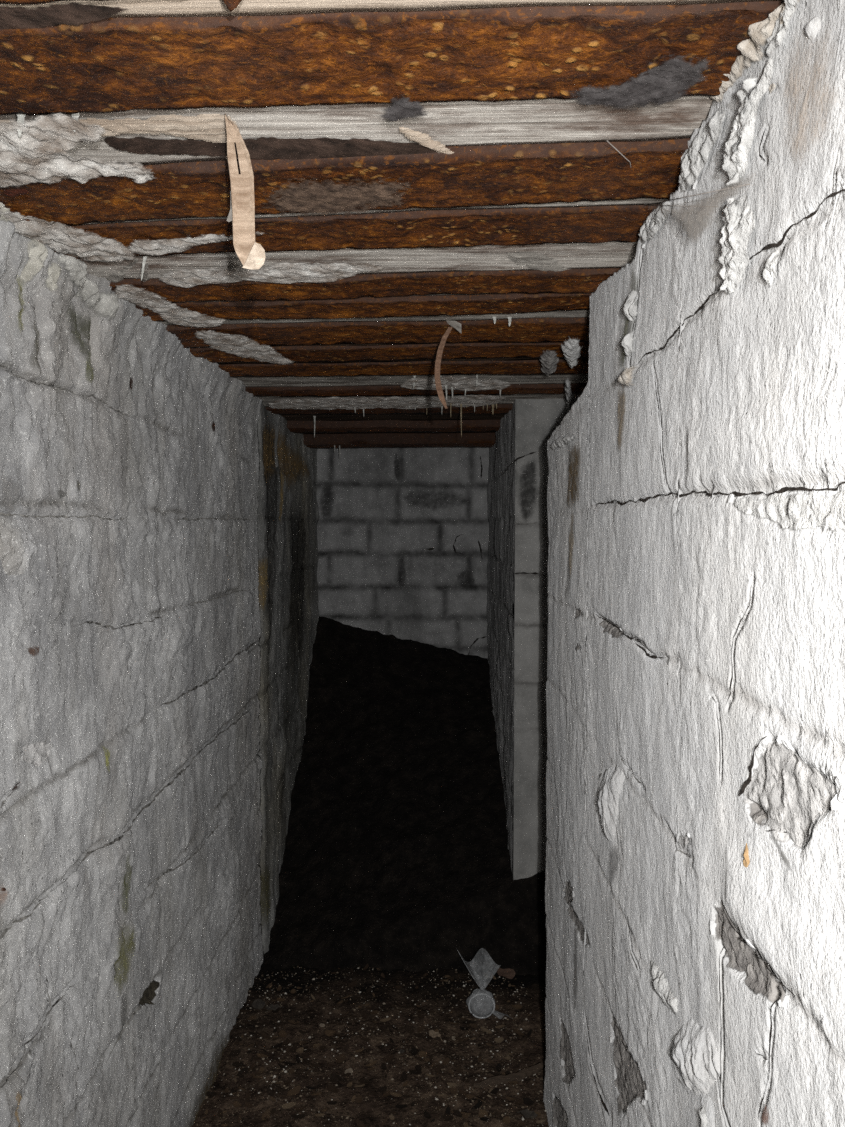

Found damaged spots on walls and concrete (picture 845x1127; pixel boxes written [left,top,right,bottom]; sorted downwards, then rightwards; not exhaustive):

peeling [78,114,240,143]
crack [749,189,845,276]
crack [596,283,845,505]
damp [521,463,536,518]
crack [159,640,260,707]
crack [596,614,663,659]
spalling [739,736,845,869]
spalling [136,979,160,1008]
flaking render [710,903,801,1007]
spalling [610,1016,648,1115]